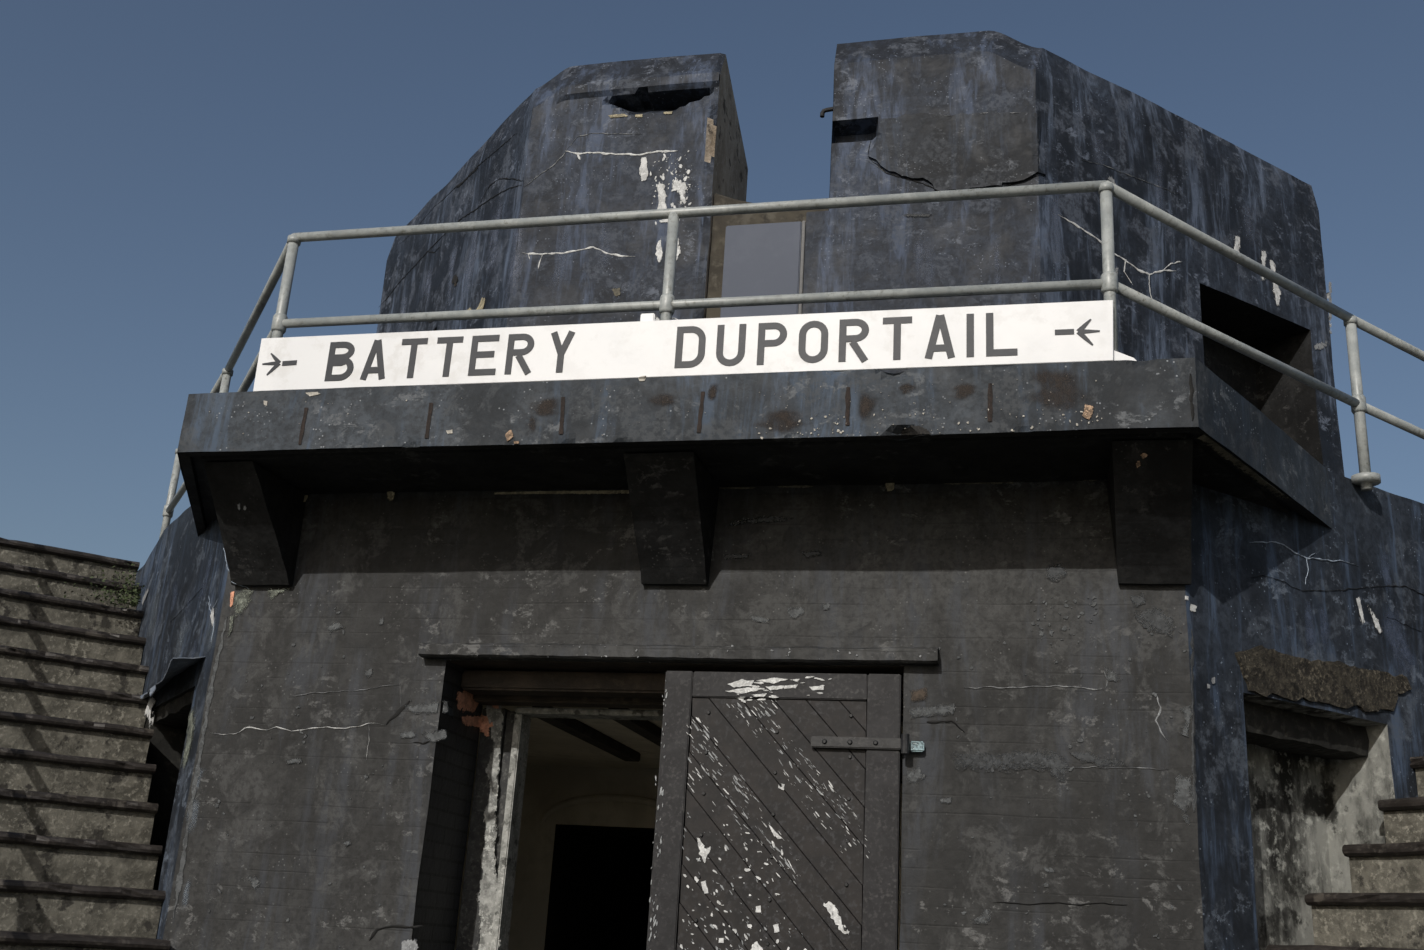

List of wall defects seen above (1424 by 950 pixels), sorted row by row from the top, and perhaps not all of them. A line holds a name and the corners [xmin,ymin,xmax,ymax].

crack [379,133,676,307]
peeling [639,150,699,262]
crack [868,119,934,189]
crack [1058,214,1180,298]
peeling [140,588,299,918]
crack [215,683,435,759]
peeling [399,691,504,950]
peeling [680,717,807,950]
peeling [727,676,869,859]
crack [965,672,1108,690]
crack [1024,696,1166,770]
peeling [823,901,850,934]